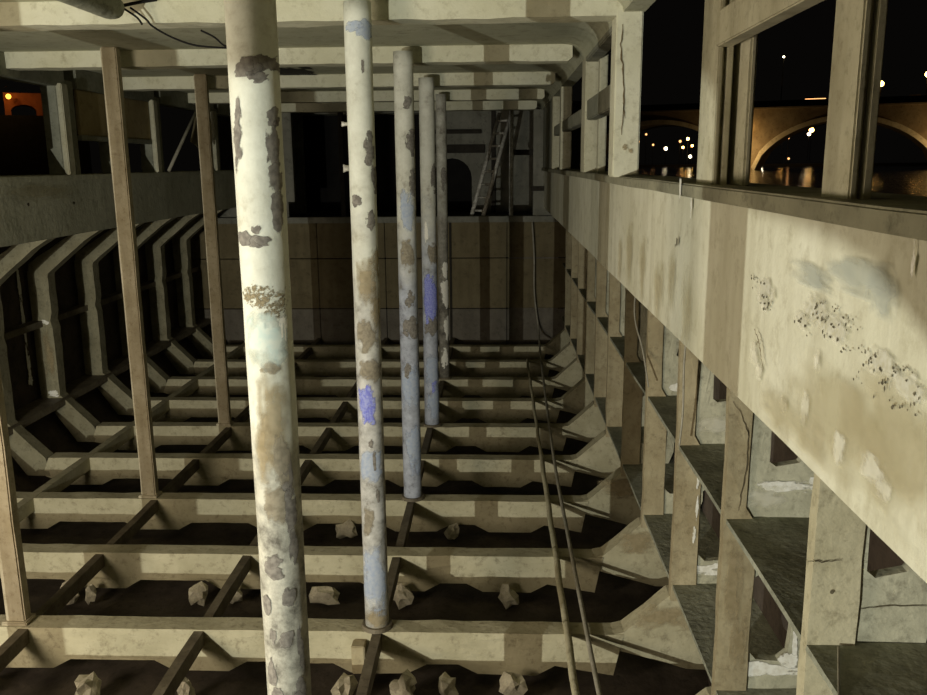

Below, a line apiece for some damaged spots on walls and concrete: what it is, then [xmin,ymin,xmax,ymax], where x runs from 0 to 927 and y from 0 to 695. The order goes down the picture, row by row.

peeling [235,54,317,83]
crack [618,24,626,135]
peeling [233,98,243,171]
peeling [238,106,284,248]
peeling [363,130,377,194]
peeling [365,210,376,231]
corrosion [242,285,287,319]
spalling [794,299,922,416]
corrosion [257,388,291,485]
crack [733,402,749,511]
peeling [264,458,299,607]
peeling [268,628,307,695]